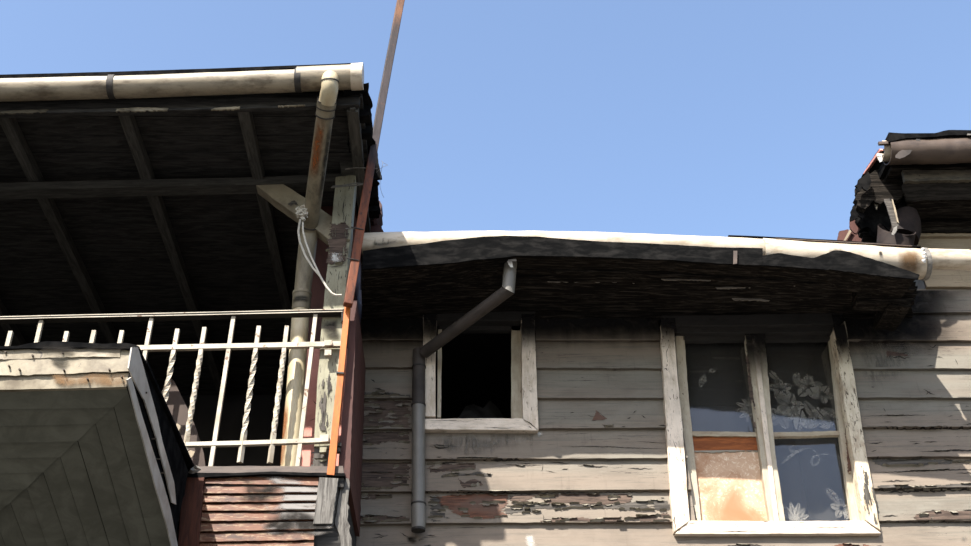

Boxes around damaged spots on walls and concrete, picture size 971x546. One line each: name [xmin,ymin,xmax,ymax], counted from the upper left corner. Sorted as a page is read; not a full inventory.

peeling [326,222,350,265]
peeling [319,374,332,432]
peeling [363,390,411,446]
peeling [361,462,412,499]
peeling [427,462,671,525]
peeling [863,456,971,524]